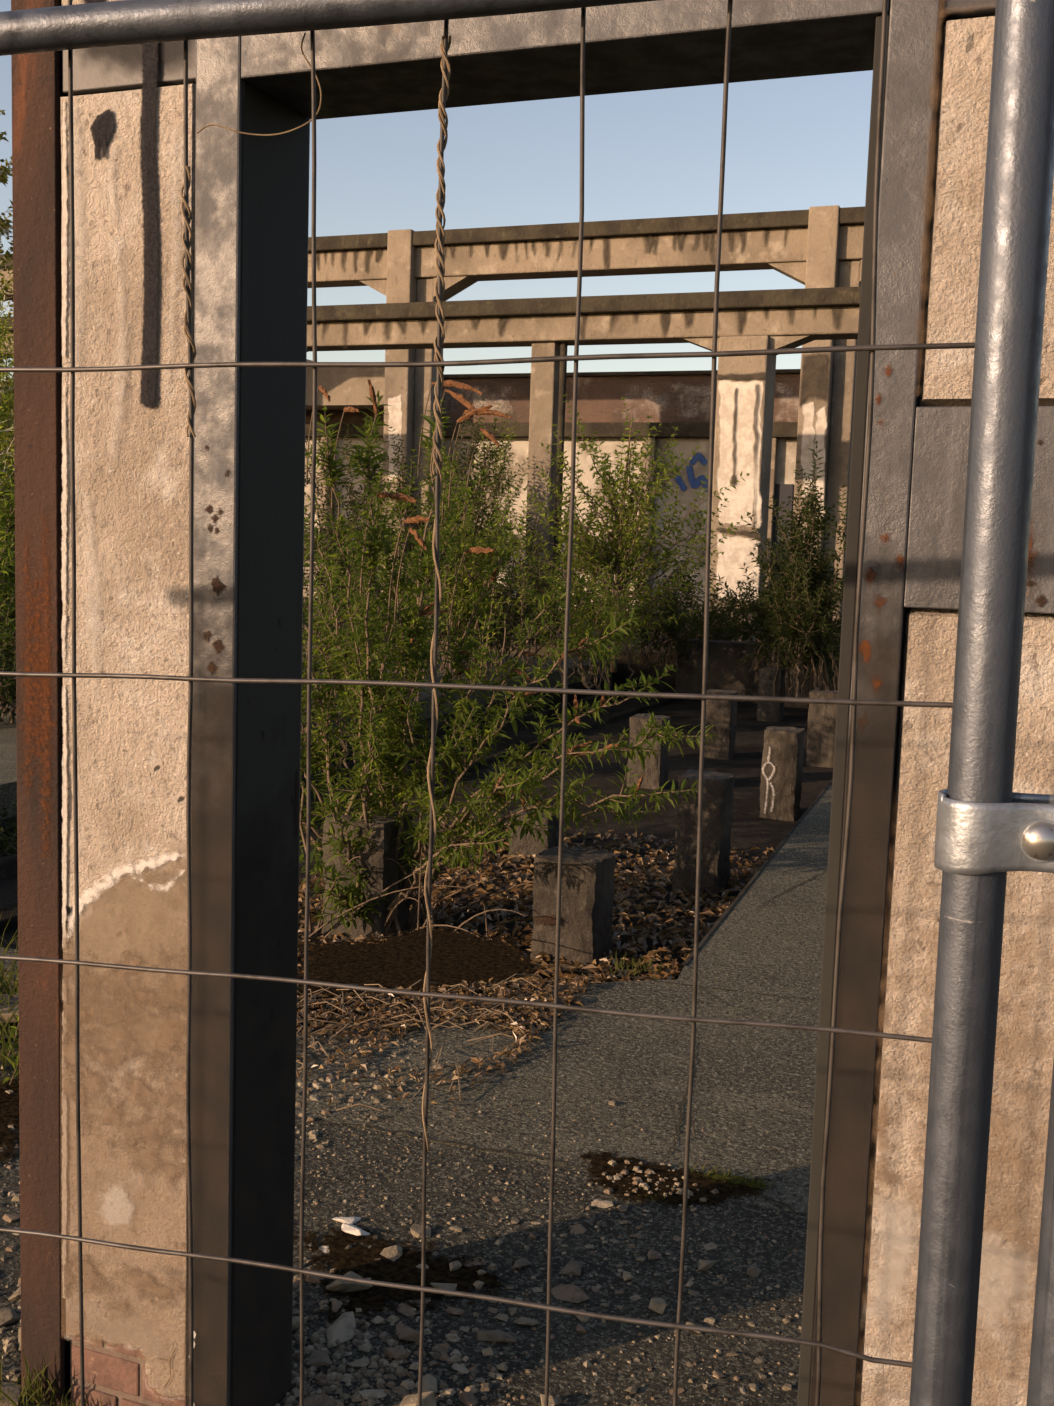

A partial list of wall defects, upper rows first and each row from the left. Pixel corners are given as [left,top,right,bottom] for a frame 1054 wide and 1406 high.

rust [205,505,223,533]
rust [211,577,225,594]
leakage [63,853,188,1185]
leakage [64,1256,184,1317]
flaking render [70,1336,195,1406]